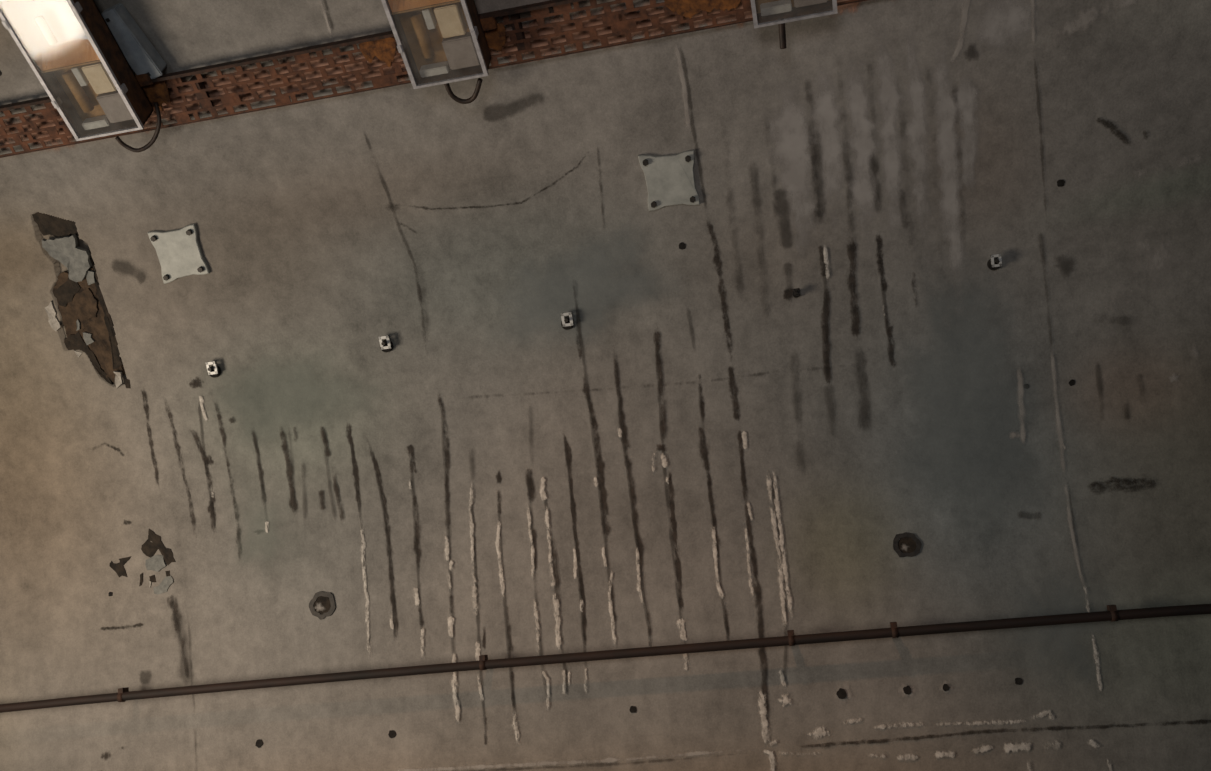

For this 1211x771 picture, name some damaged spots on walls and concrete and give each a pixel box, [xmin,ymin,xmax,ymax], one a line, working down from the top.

rust [0,113,74,145]
rust [144,47,407,129]
rust [489,0,753,61]
spalling [32,212,131,389]
spalling [109,529,175,595]
water stain [166,410,242,558]
water stain [526,469,561,649]
water stain [564,437,586,641]
water stain [583,384,616,644]
water stain [614,360,651,646]
water stain [652,332,687,671]
water stain [728,367,793,771]